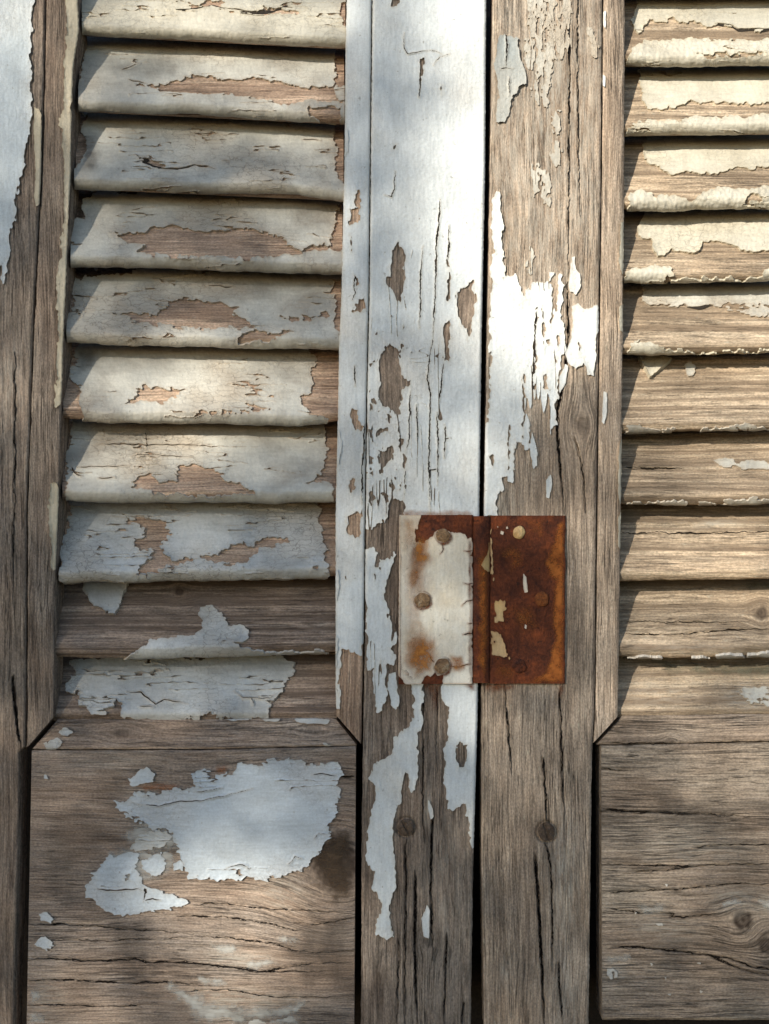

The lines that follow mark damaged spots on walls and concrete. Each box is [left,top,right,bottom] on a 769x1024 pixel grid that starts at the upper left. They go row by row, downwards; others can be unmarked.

peeling [586,11,606,58]
peeling [0,0,42,284]
peeling [618,0,769,318]
peeling [625,339,769,379]
peeling [43,0,599,940]
corrosion [412,541,429,584]
corrosion [409,559,486,675]
corrosion [537,524,563,681]
crack [542,687,565,813]
peeling [34,936,54,951]
crack [534,841,563,1023]